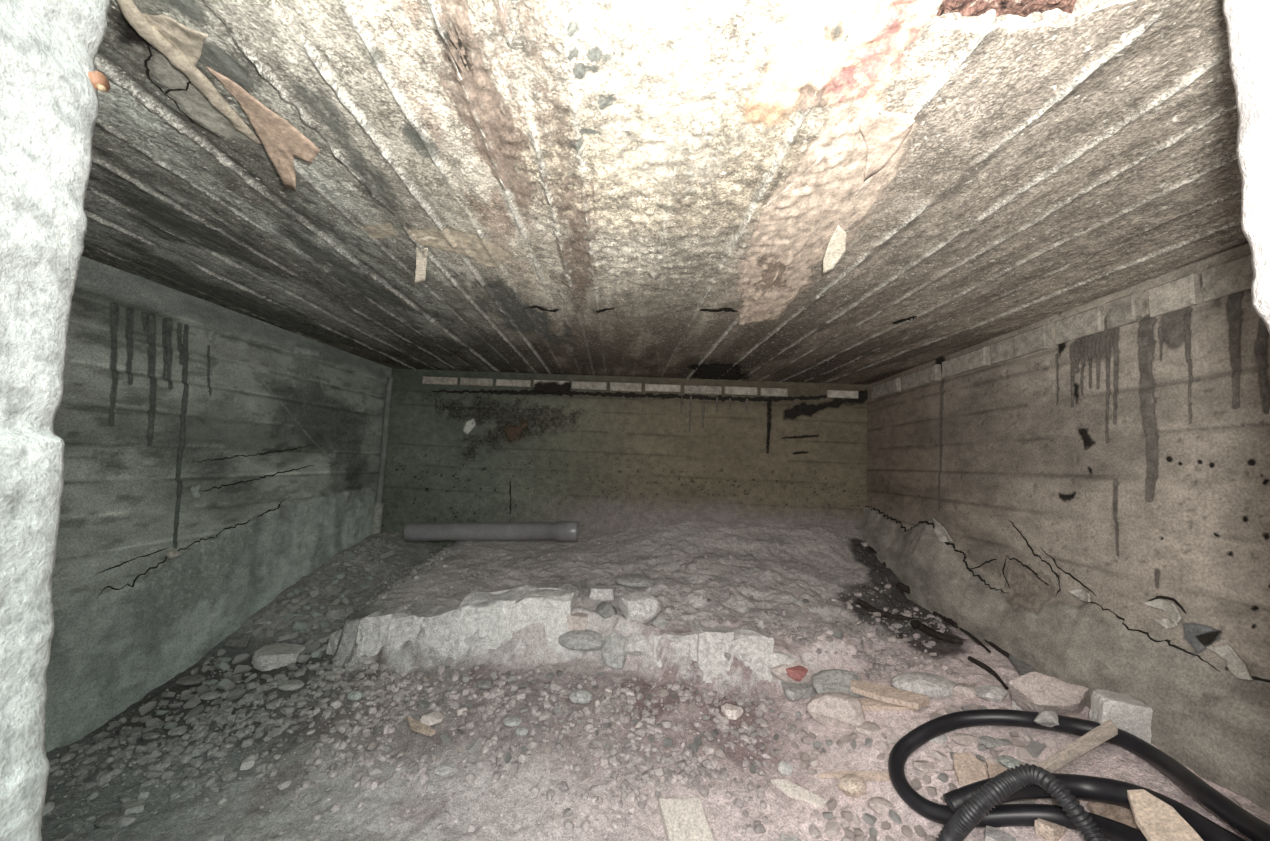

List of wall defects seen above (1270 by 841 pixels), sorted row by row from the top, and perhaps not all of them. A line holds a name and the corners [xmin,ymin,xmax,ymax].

peeling [144,45,259,146]
leakage [109,303,260,625]
crack [97,445,314,597]
leakage [116,240,375,491]
leakage [429,395,578,460]
leakage [1055,318,1119,443]
leakage [1137,308,1194,502]
leakage [1214,289,1270,414]